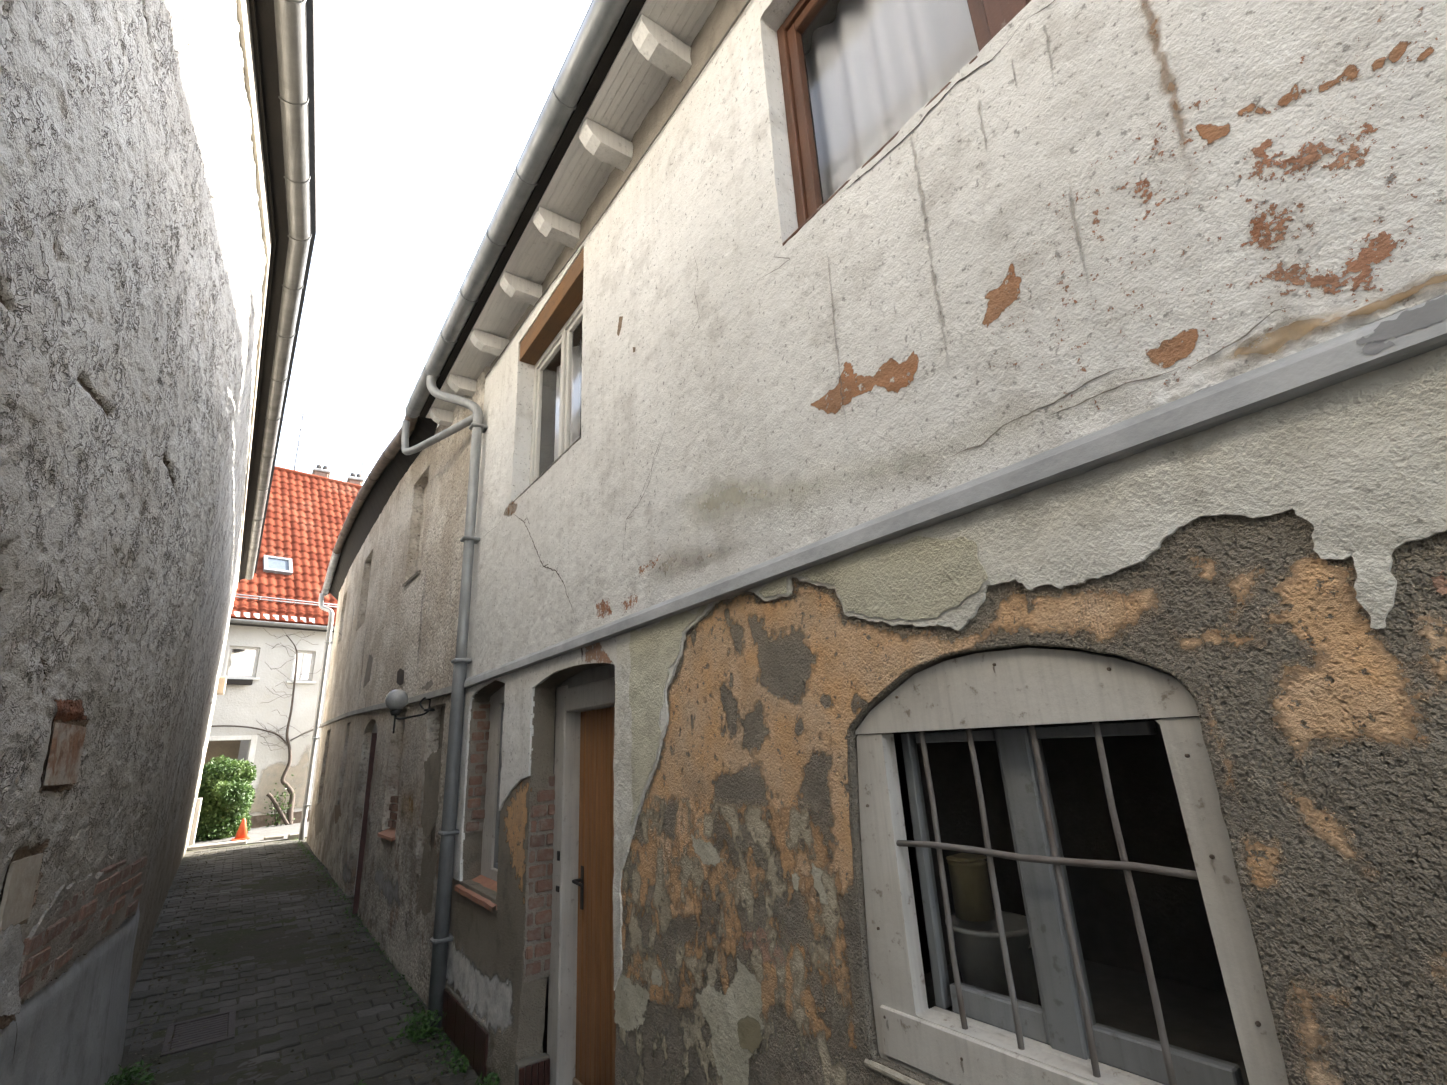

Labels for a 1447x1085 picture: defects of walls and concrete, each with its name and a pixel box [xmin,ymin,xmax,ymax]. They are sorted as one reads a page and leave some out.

peeling [982,4,1447,395]
peeling [811,351,919,414]
damp [1233,274,1447,358]
crack [515,515,583,662]
peeling [596,593,638,619]
spalling [39,699,90,794]
flaking render [0,838,147,1029]
spalling [416,748,442,916]
spalling [445,702,555,1085]
spalling [614,509,1447,1085]